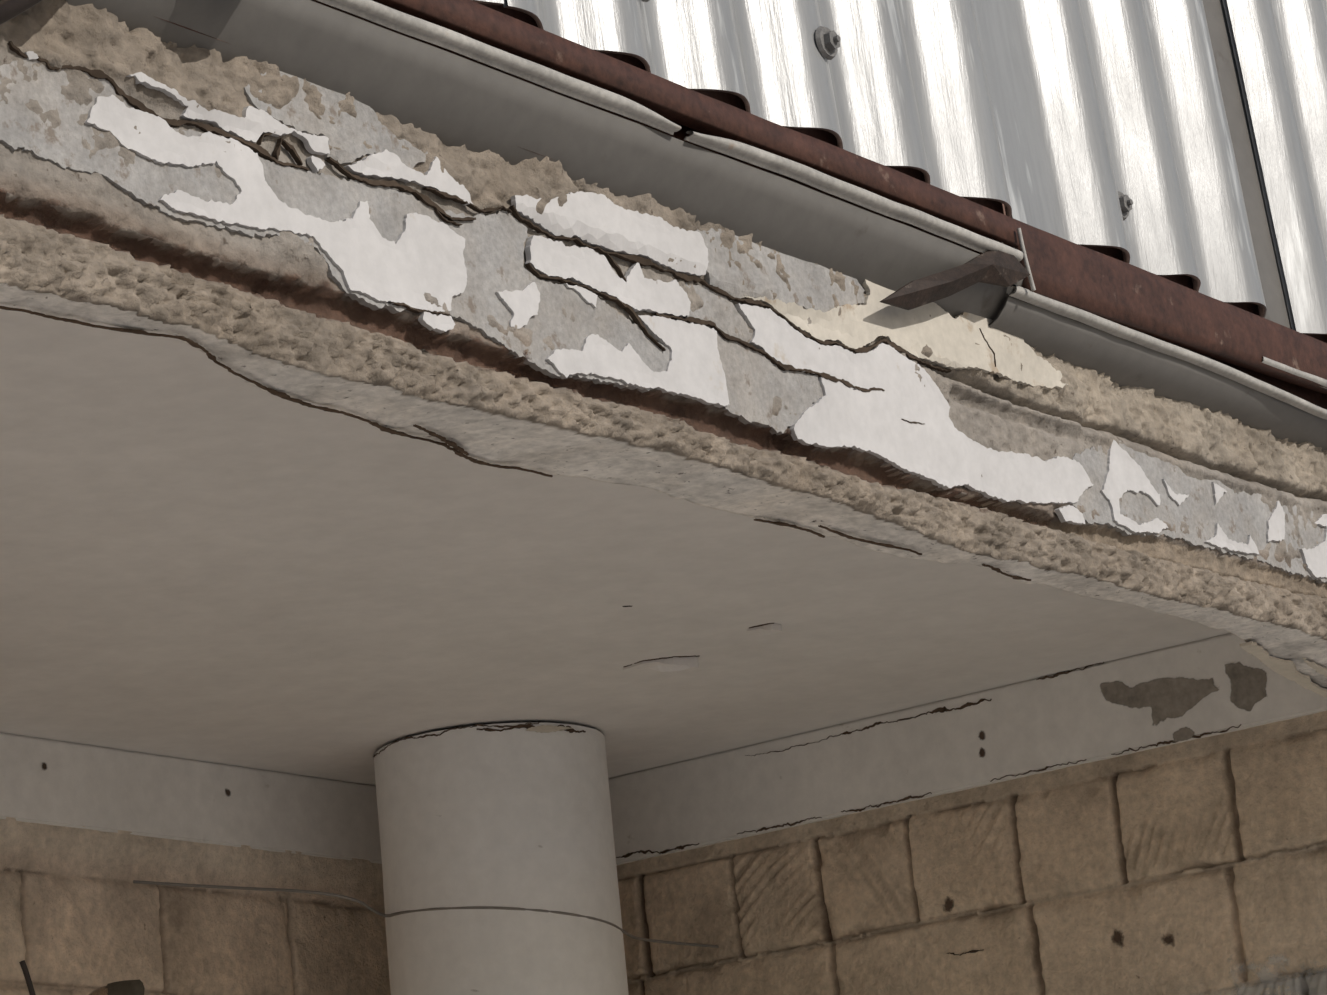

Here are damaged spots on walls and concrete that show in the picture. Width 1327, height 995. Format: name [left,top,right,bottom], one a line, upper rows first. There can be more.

crack [7,41,952,392]
corrosion [0,189,912,489]
flaking render [0,51,1327,584]
crack [979,328,996,367]
crack [0,306,553,477]
corrosion [928,488,1049,527]
crack [745,699,992,756]
crack [1036,662,1105,680]
peeling [1100,662,1267,742]